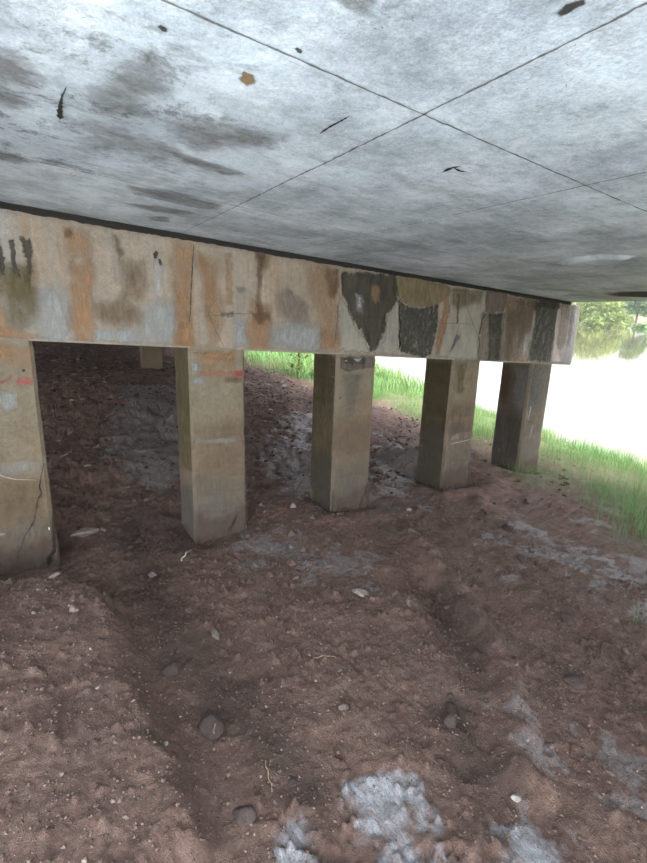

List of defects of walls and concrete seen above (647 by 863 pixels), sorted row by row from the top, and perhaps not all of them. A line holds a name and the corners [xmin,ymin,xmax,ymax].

corrosion [240,72,254,86]
damp [0,236,33,294]
corrosion [248,254,270,347]
damp [341,272,398,351]
damp [493,296,557,466]
crack [17,465,57,566]